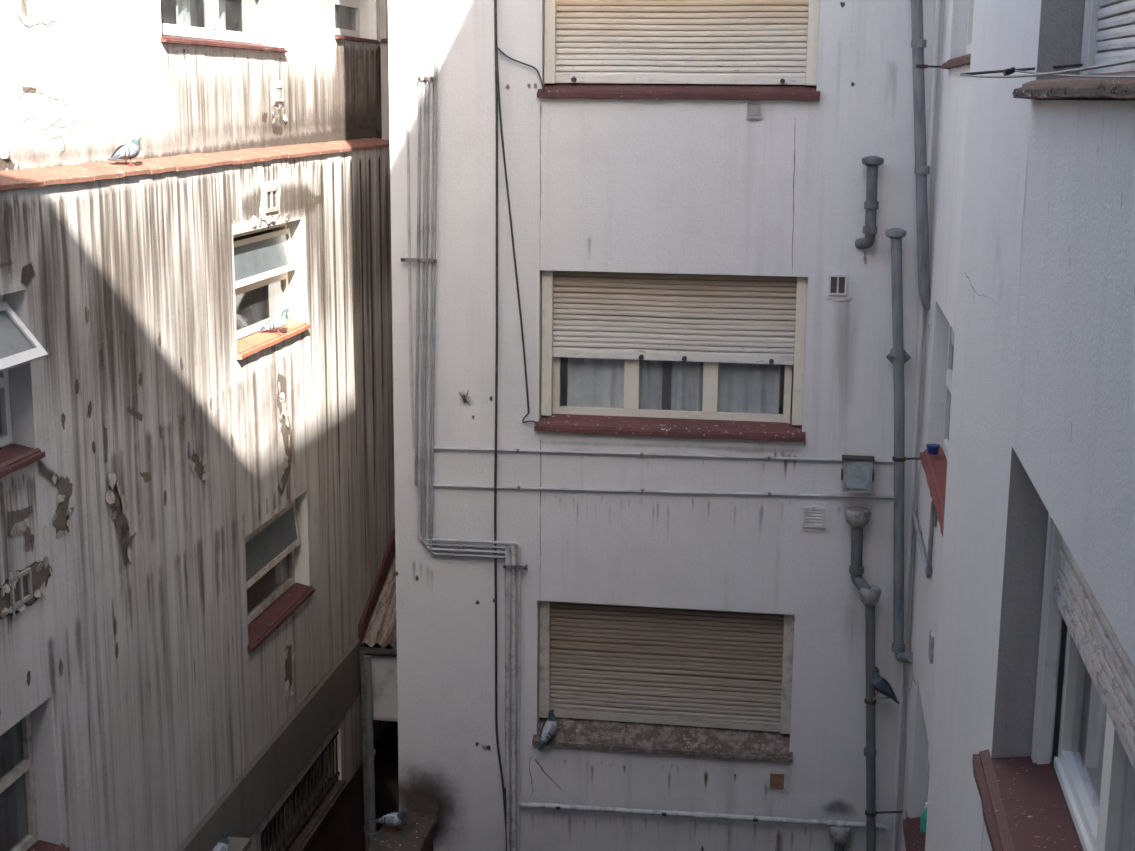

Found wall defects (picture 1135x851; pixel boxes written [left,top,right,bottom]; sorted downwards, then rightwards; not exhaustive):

crack [16,0,90,153]
damp [110,46,382,161]
damp [0,158,391,446]
spalling [0,460,74,622]
peeling [92,427,137,566]
damp [185,543,203,601]
damp [395,779,447,839]